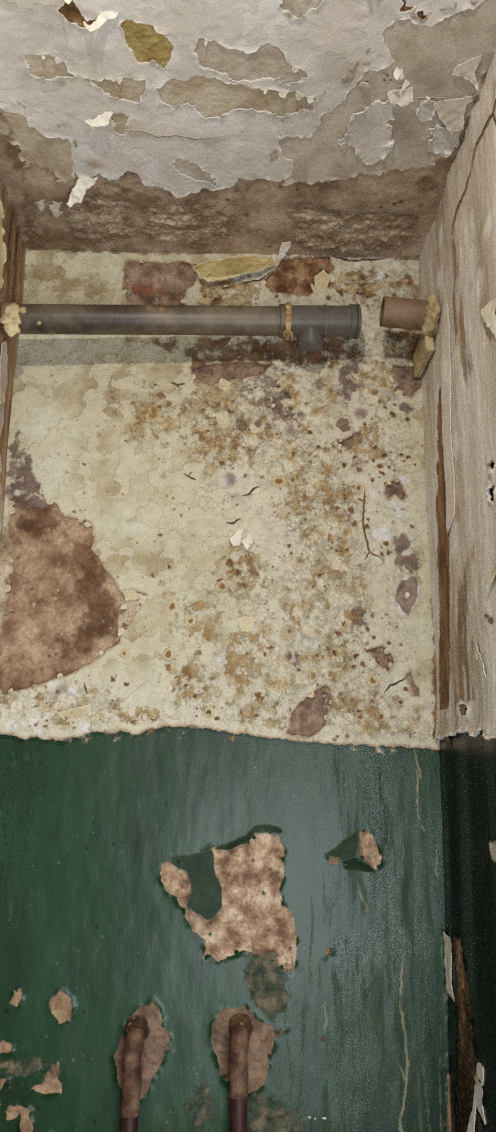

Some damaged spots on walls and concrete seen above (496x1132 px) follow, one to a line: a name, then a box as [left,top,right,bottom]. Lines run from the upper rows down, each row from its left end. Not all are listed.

peeling [24,0,322,134]
damp [0,114,121,303]
spalling [123,209,417,305]
damp [359,255,420,299]
damp [5,431,65,535]
peeling [0,456,146,707]
damp [71,540,116,652]
damp [126,328,475,754]
efflorescence [0,686,117,742]
peeling [287,686,333,737]
spalling [160,833,297,971]
spalling [443,932,486,1132]